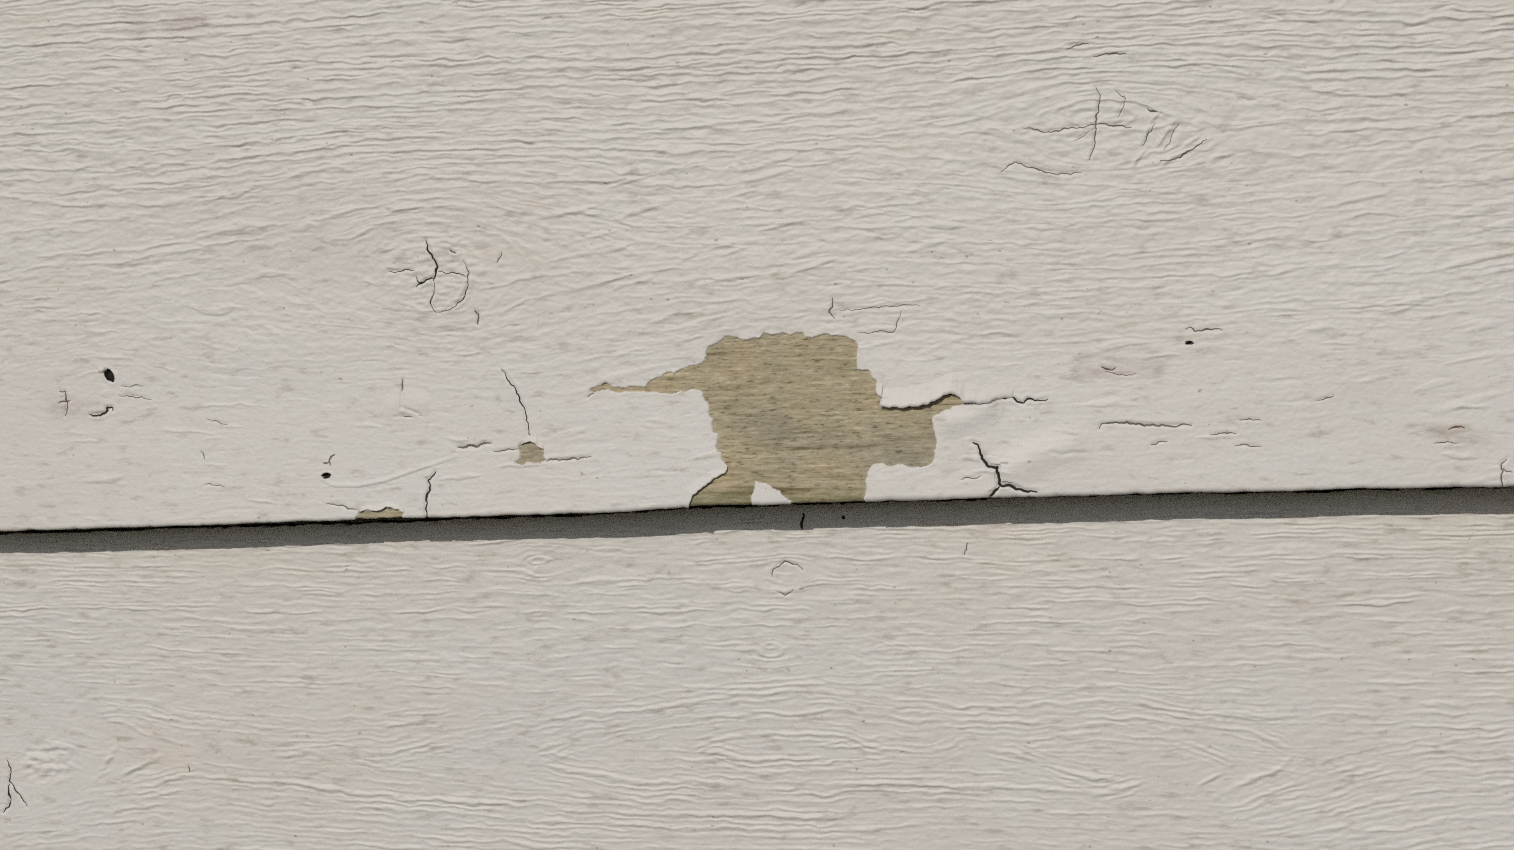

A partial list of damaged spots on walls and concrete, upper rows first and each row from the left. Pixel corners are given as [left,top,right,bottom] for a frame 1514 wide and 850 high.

crack [390,240,502,325]
peeling [515,435,545,465]
peeling [591,333,1014,508]
crack [961,442,1037,497]